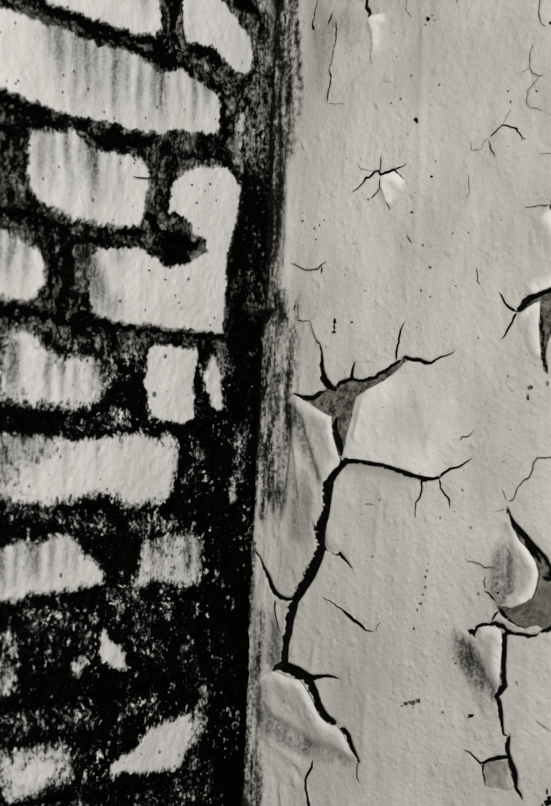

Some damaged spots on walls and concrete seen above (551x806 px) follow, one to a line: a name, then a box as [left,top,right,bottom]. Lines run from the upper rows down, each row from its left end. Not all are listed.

crack [470,45,545,156]
peeling [380,171,406,208]
peeling [515,205,551,386]
crack [291,320,455,401]
peeling [291,358,473,482]
crack [495,457,551,582]
crack [255,416,472,782]
peeling [475,507,551,693]
peeling [259,671,357,763]
crack [304,760,313,806]
peeling [484,760,514,791]
crack [463,560,551,800]